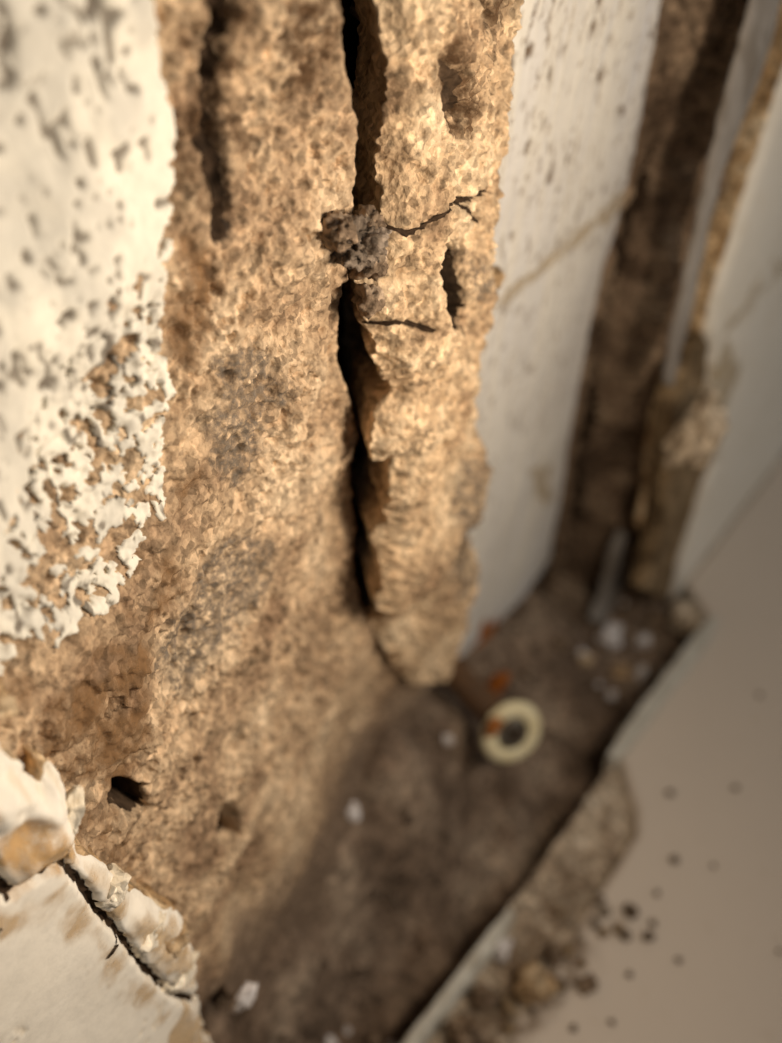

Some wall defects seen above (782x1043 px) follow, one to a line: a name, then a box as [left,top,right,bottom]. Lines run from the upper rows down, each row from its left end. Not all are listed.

crack [191,0,232,241]
crack [339,0,360,100]
spalling [438,59,463,115]
crack [385,187,487,237]
crack [336,283,437,413]
spalling [439,248,465,330]
flaking render [492,265,505,290]
flaking render [543,0,782,602]
flaking render [0,0,446,1033]
crack [348,443,363,580]
crack [0,839,192,1002]